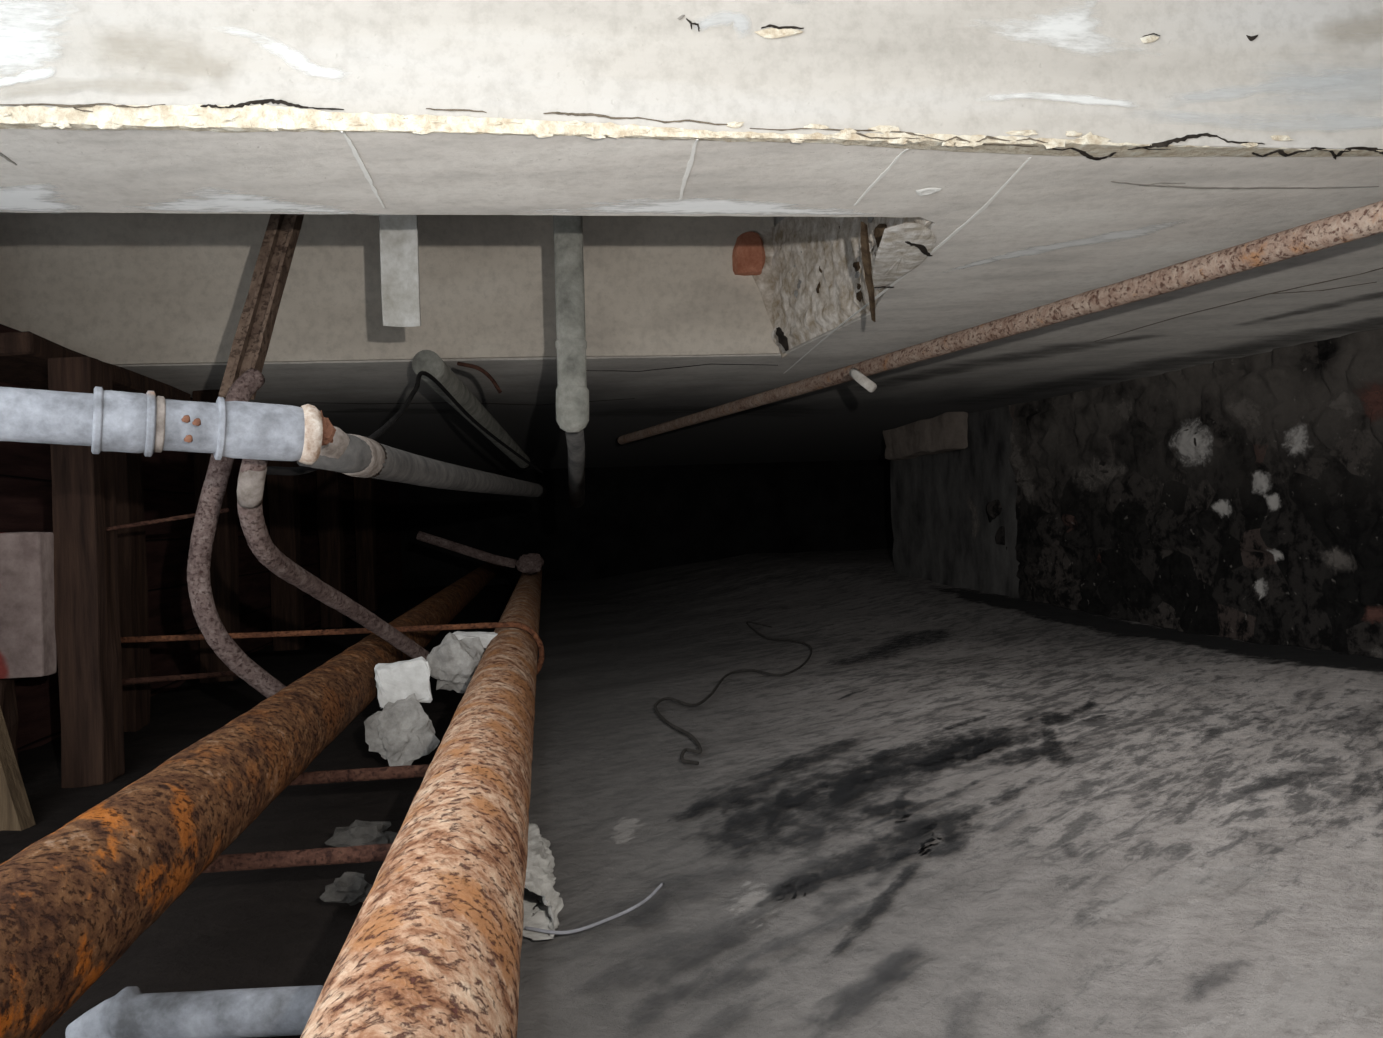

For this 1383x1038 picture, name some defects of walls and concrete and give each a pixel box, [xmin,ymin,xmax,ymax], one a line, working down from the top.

spalling [755,24,804,39]
spalling [0,104,1383,158]
spalling [732,216,936,358]
crack [543,112,1383,402]
water stain [677,703,1106,952]